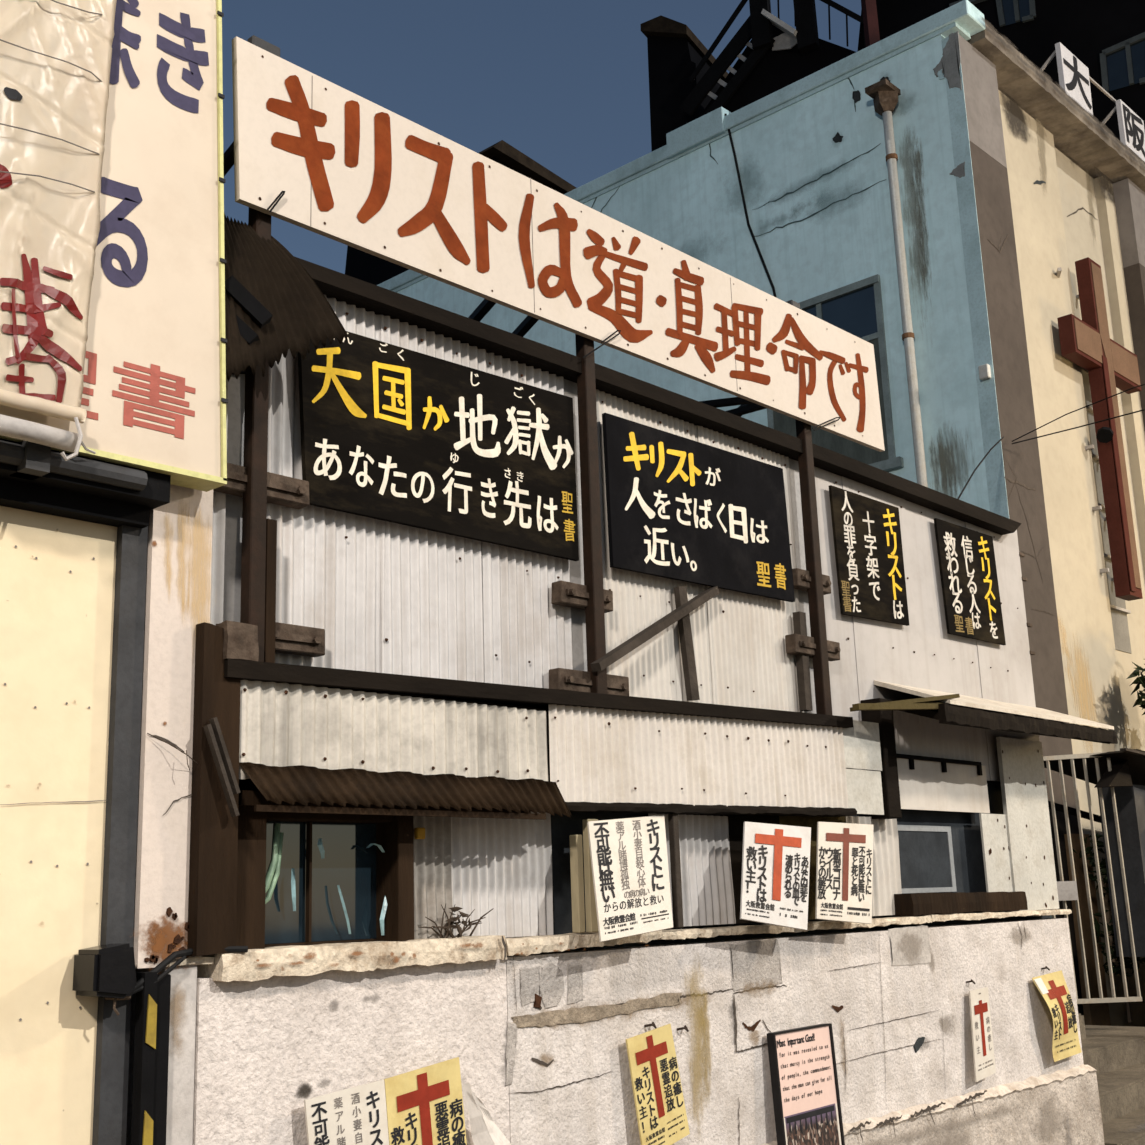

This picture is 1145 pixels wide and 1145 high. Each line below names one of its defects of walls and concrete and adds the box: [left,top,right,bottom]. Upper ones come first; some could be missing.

peeling [933,31,962,90]
crack [753,143,885,237]
crack [150,735,184,752]
corrosion [144,907,189,963]
water stain [690,978,710,1108]